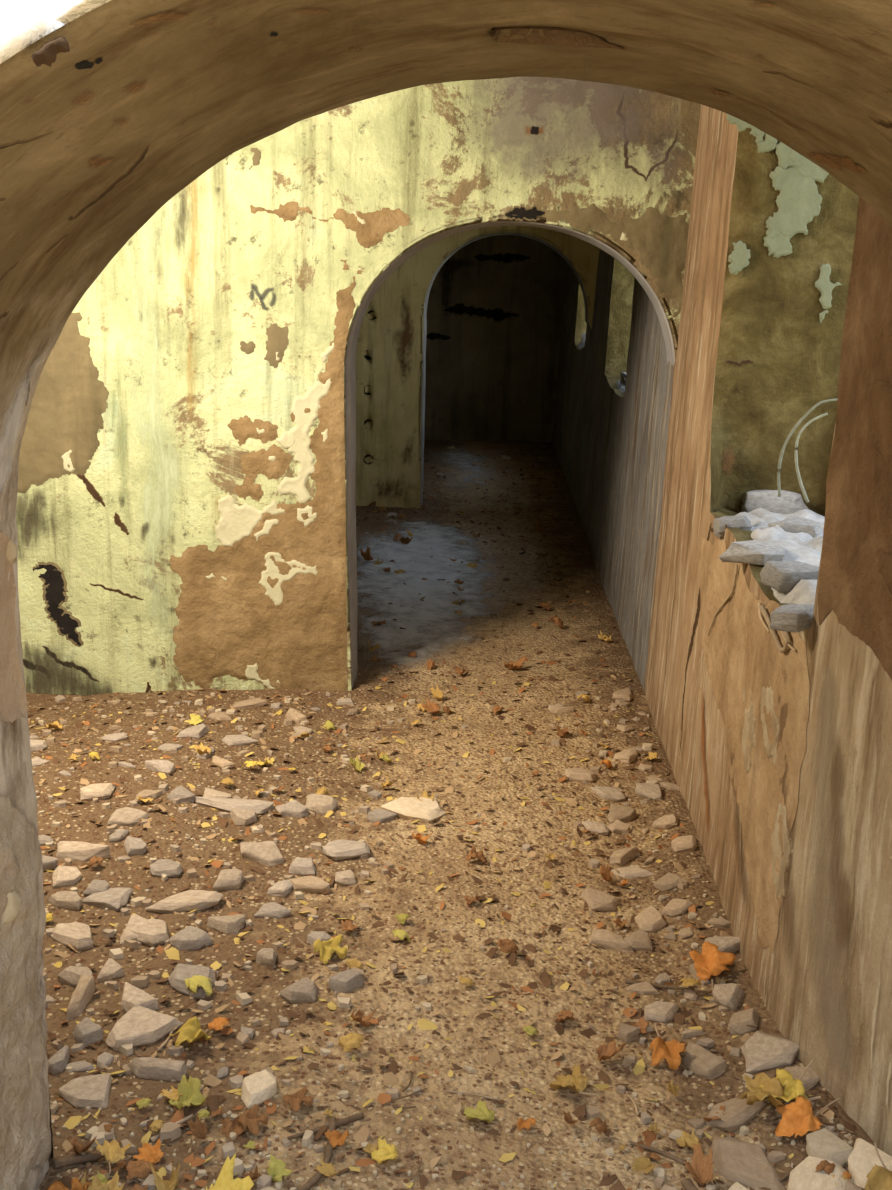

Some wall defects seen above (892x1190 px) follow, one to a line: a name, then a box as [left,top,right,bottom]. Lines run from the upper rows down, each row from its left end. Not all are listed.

spalling [489,26,625,50]
peeling [250,201,410,248]
crack [615,96,678,181]
peeling [728,241,751,275]
peeling [726,113,829,258]
peeling [18,312,109,493]
peeling [169,260,363,691]
spalling [815,196,892,680]
spalling [0,532,27,723]
crack [23,562,144,682]